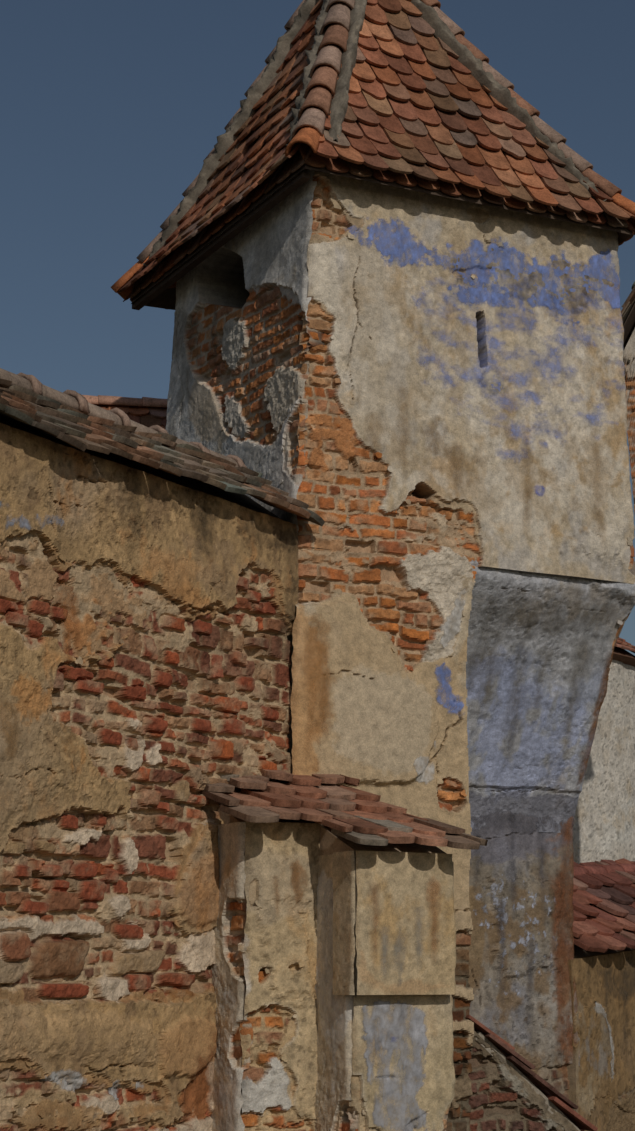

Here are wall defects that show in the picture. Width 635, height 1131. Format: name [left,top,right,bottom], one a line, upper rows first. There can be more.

crack [347,253,375,400]
peeling [309,174,621,378]
crack [171,578,248,619]
spalling [0,282,485,1005]
water stain [476,884,557,973]
spalling [0,1056,214,1131]
spalling [230,1004,317,1131]
peeling [333,1000,428,1131]
spalling [442,928,572,1131]